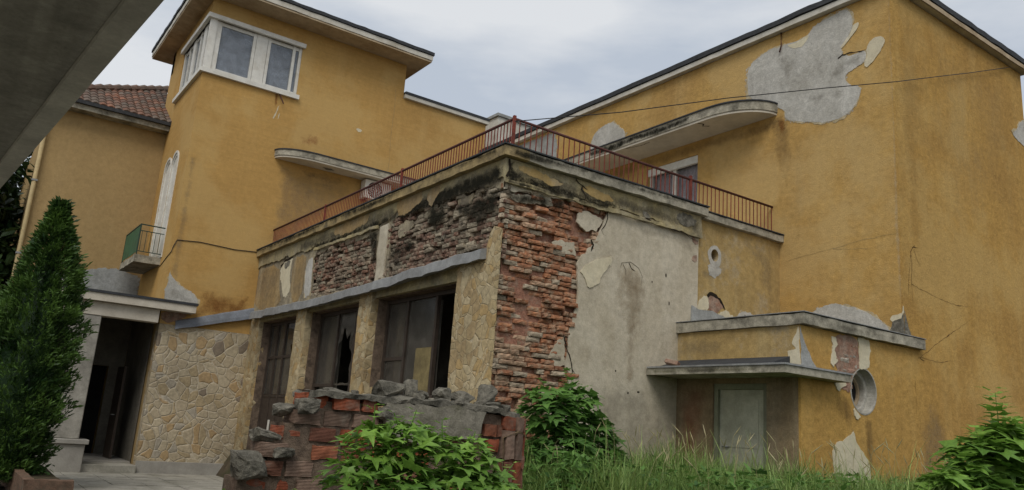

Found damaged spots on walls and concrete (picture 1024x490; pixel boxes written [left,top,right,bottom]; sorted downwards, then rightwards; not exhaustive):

flaking render [745,8,885,125]
flaking render [591,120,627,149]
damp [411,163,615,226]
flaking render [161,270,200,323]
spalling [280,166,698,440]
spalling [697,292,752,317]
flaking render [813,303,911,335]
crack [787,233,974,401]
spalling [830,334,871,392]
flaking render [832,432,871,488]